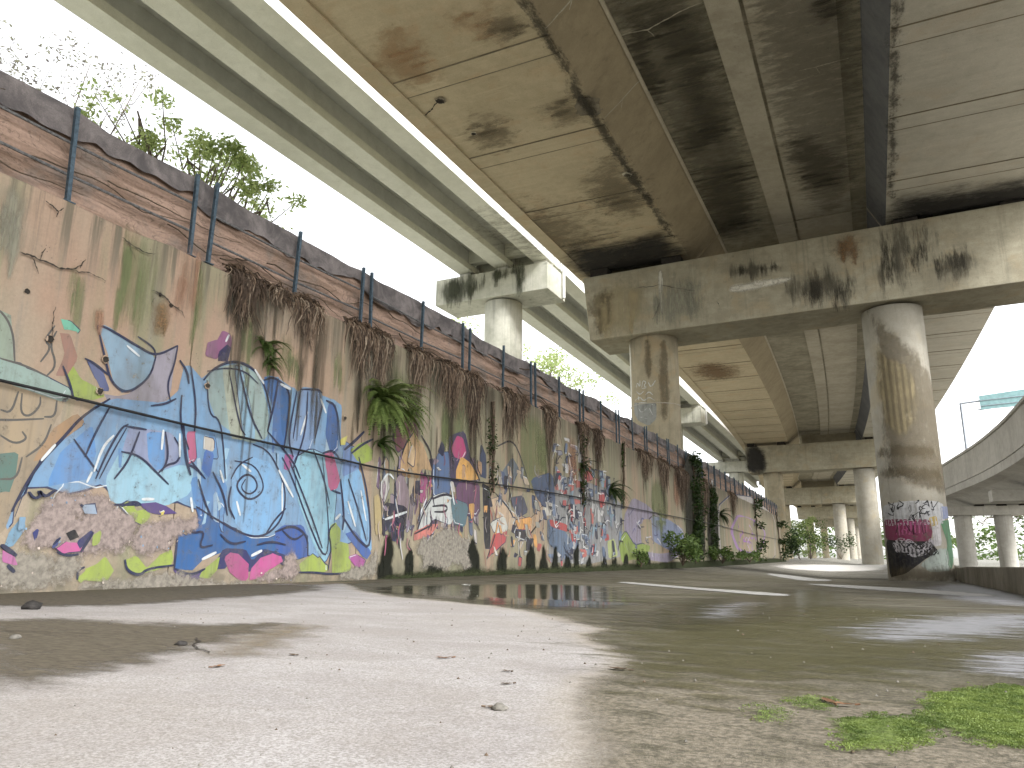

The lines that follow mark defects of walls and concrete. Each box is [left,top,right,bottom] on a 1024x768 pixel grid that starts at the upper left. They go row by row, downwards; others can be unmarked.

damp [516,0,699,320]
crack [21,248,104,280]
damp [443,265,525,306]
damp [730,263,849,304]
corrosion [837,236,857,264]
damp [937,252,971,275]
corrosion [698,364,738,379]
peeling [0,489,245,590]
peeling [418,528,471,570]